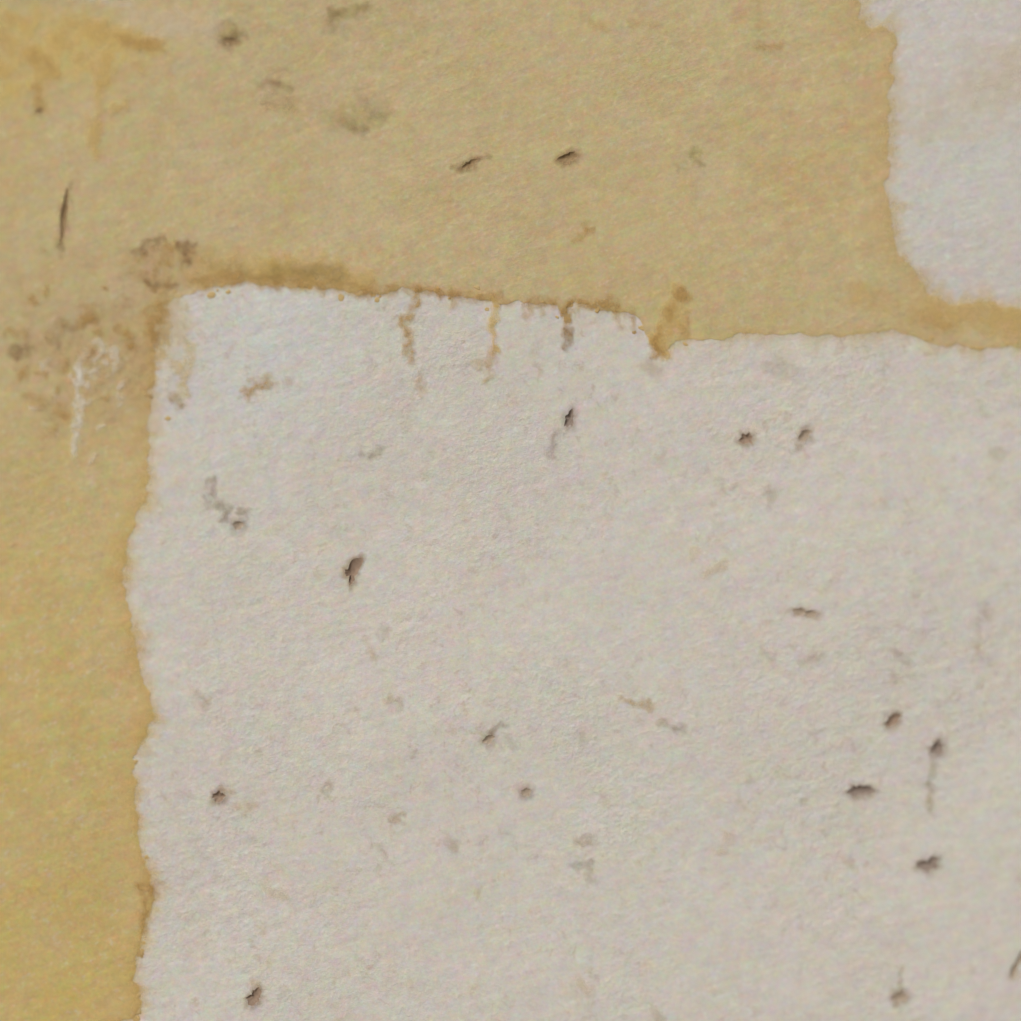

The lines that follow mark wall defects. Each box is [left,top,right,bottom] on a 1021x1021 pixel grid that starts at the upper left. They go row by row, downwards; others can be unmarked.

water stain [202,255,373,292]
peeling [858,0,1021,309]
peeling [118,280,1021,1021]